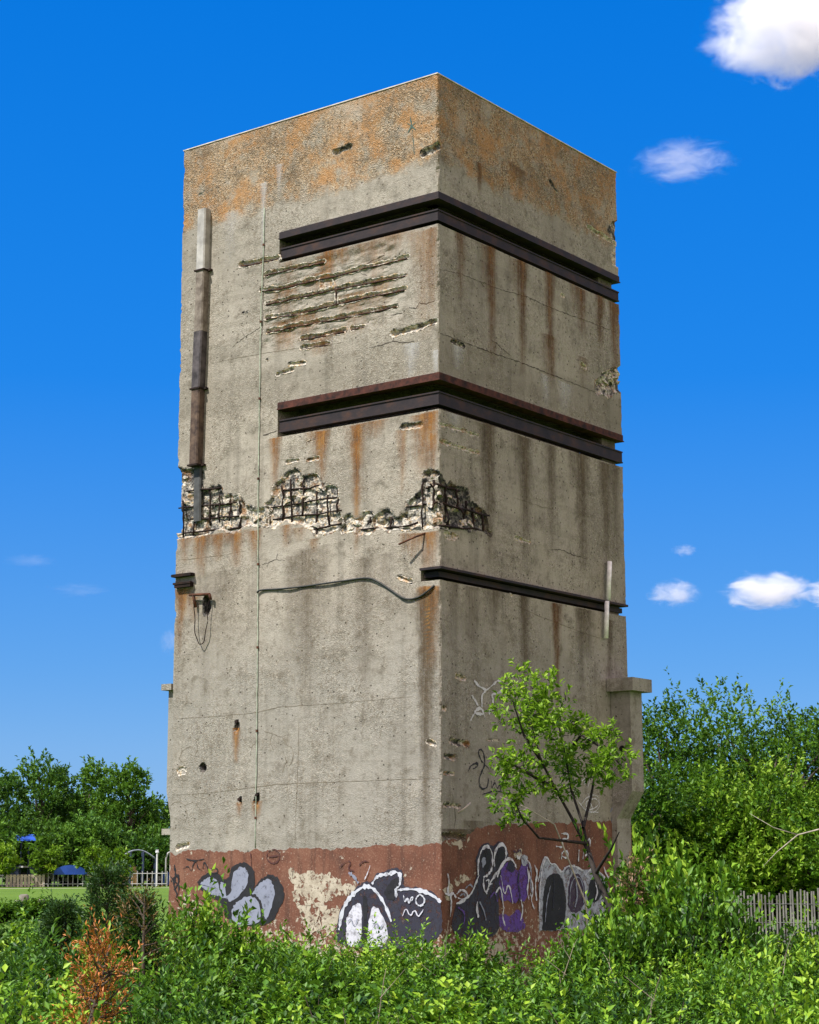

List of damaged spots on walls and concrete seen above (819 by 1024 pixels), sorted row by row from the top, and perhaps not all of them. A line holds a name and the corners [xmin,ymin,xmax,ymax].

spalling [240,258,324,277]
spalling [260,258,407,378]
spalling [389,318,439,338]
corrosion [518,260,526,330]
corrosion [598,295,619,349]
spalling [595,365,621,399]
spalling [176,455,492,545]
peeling [289,867,356,936]